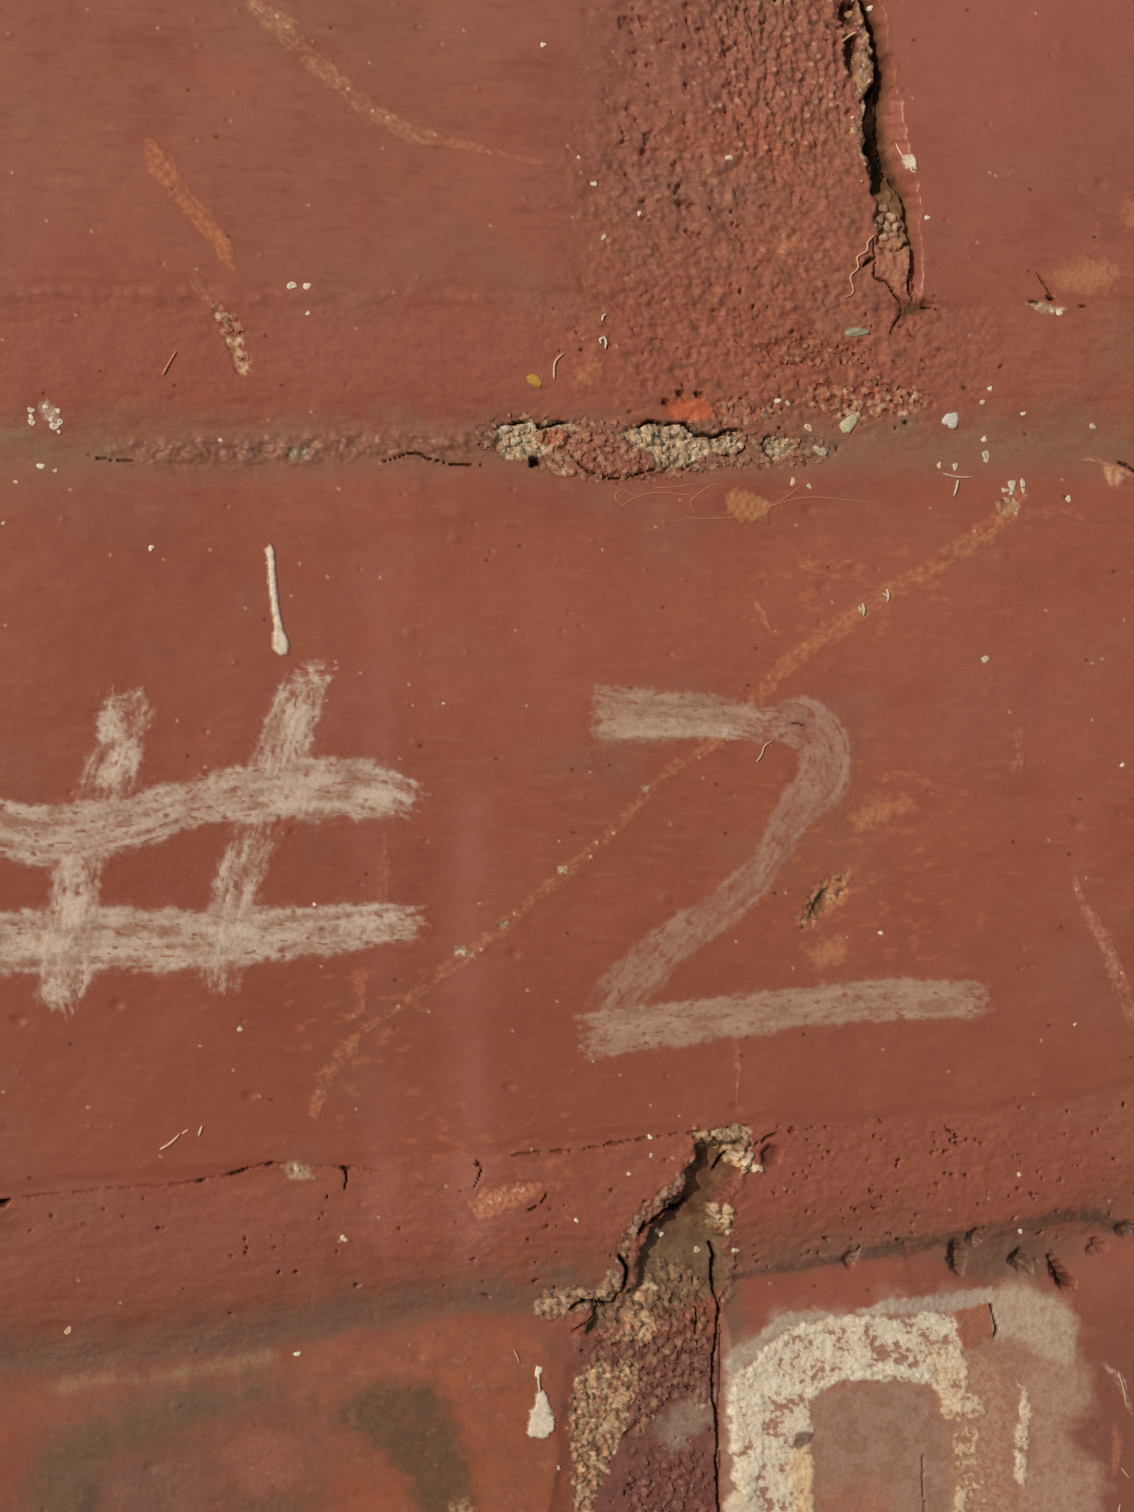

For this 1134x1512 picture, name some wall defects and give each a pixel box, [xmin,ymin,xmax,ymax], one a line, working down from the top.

crack [844,0,941,338]
peeling [473,328,958,487]
crack [570,1295,601,1334]
spalling [529,1121,764,1512]
crack [693,1240,721,1419]
peeling [953,1301,999,1351]
peeling [791,1428,815,1451]